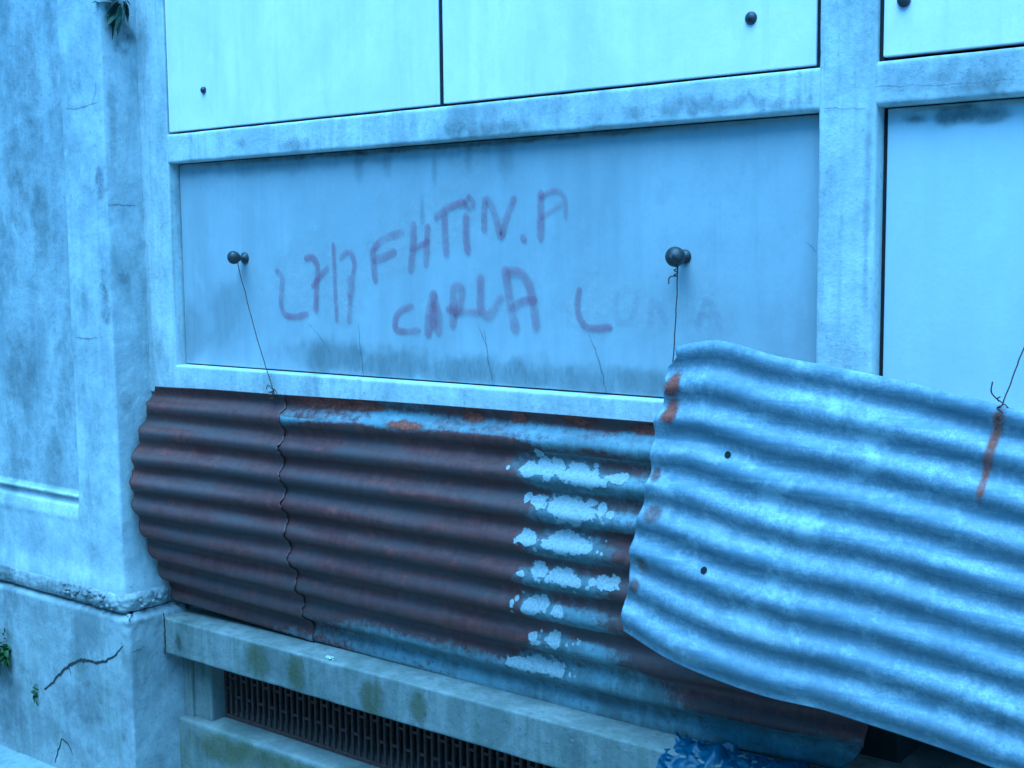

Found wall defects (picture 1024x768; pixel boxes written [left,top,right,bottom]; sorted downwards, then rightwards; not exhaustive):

rust [285,396,387,411]
rust [634,373,681,435]
rust [978,413,1001,496]
peeling [505,448,630,679]
crack [44,613,166,690]